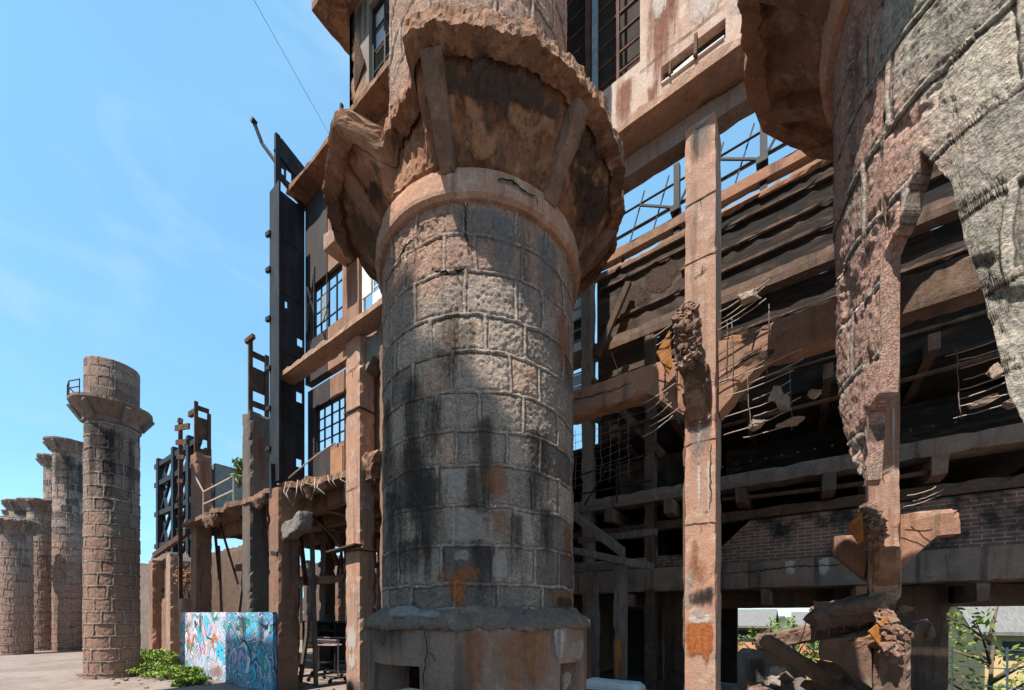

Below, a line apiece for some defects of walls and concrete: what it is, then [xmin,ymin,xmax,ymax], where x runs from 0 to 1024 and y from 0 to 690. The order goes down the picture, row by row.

crack [498,177,538,204]
water stain [383,379,441,572]
water stain [466,419,494,579]
water stain [530,433,550,552]
corrosion [685,622,713,663]